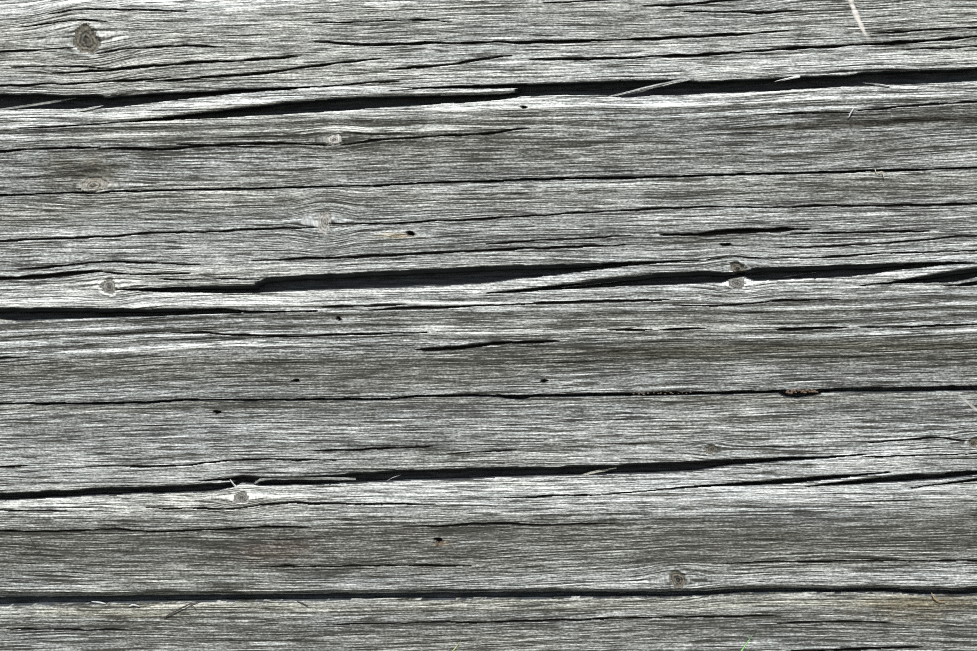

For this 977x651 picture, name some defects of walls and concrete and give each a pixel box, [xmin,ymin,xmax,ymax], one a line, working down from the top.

crack [177,299,839,352]
crack [777,323,977,331]